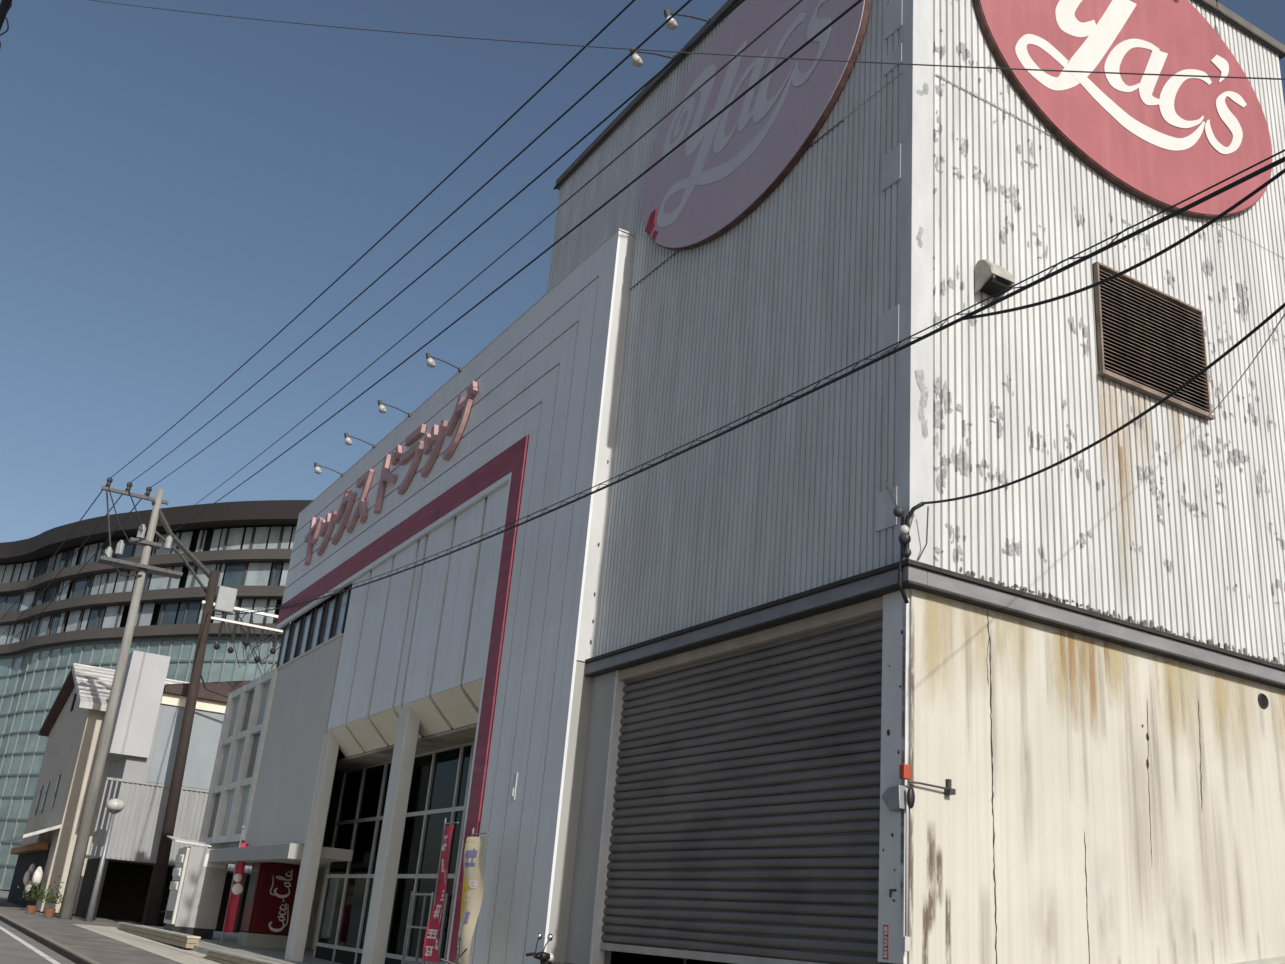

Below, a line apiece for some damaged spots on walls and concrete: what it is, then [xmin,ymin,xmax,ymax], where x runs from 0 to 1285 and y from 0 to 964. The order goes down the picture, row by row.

peeling [1186,219,1277,431]
peeling [915,369,1009,494]
peeling [1136,430,1270,525]
peeling [933,523,1285,666]
damp [902,598,946,787]
crack [987,612,997,964]
corrosion [1090,641,1107,695]
damp [1166,661,1184,719]
crack [1196,700,1204,799]
damp [901,810,913,901]
damp [910,838,950,964]
crack [1083,830,1091,964]